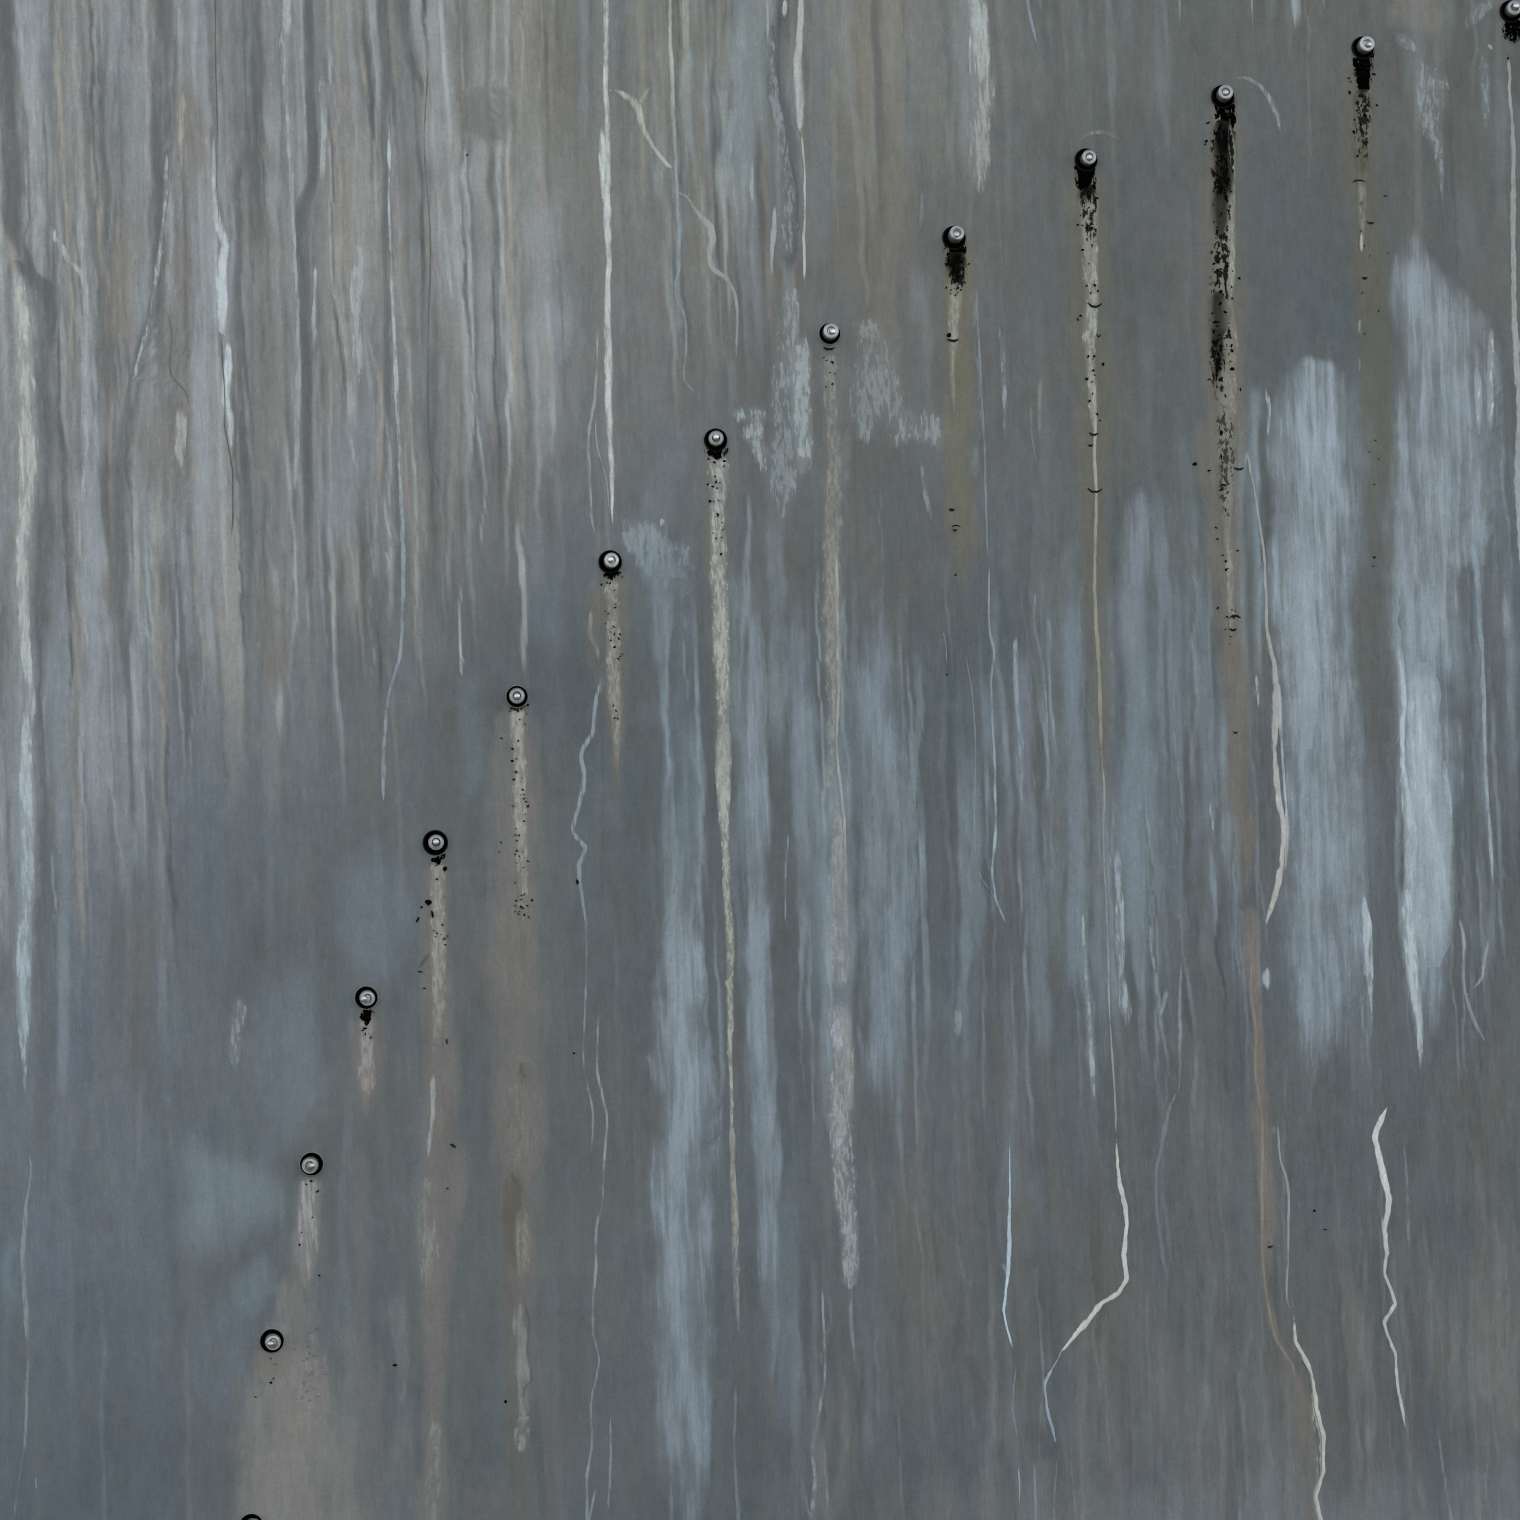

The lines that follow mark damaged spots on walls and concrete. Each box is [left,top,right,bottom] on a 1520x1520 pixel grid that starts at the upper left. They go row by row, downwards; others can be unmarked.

damp [640,347,920,1520]
rust [934,241,984,614]
damp [937,299,1049,933]
crack [1001,1118,1129,1507]
damp [1154,952,1184,1289]
rust [1191,92,1320,1520]
crack [1276,1116,1327,1520]
damp [1248,353,1374,1098]
rust [1336,51,1404,840]
crack [1372,1105,1408,1440]
damp [1393,20,1520,1094]